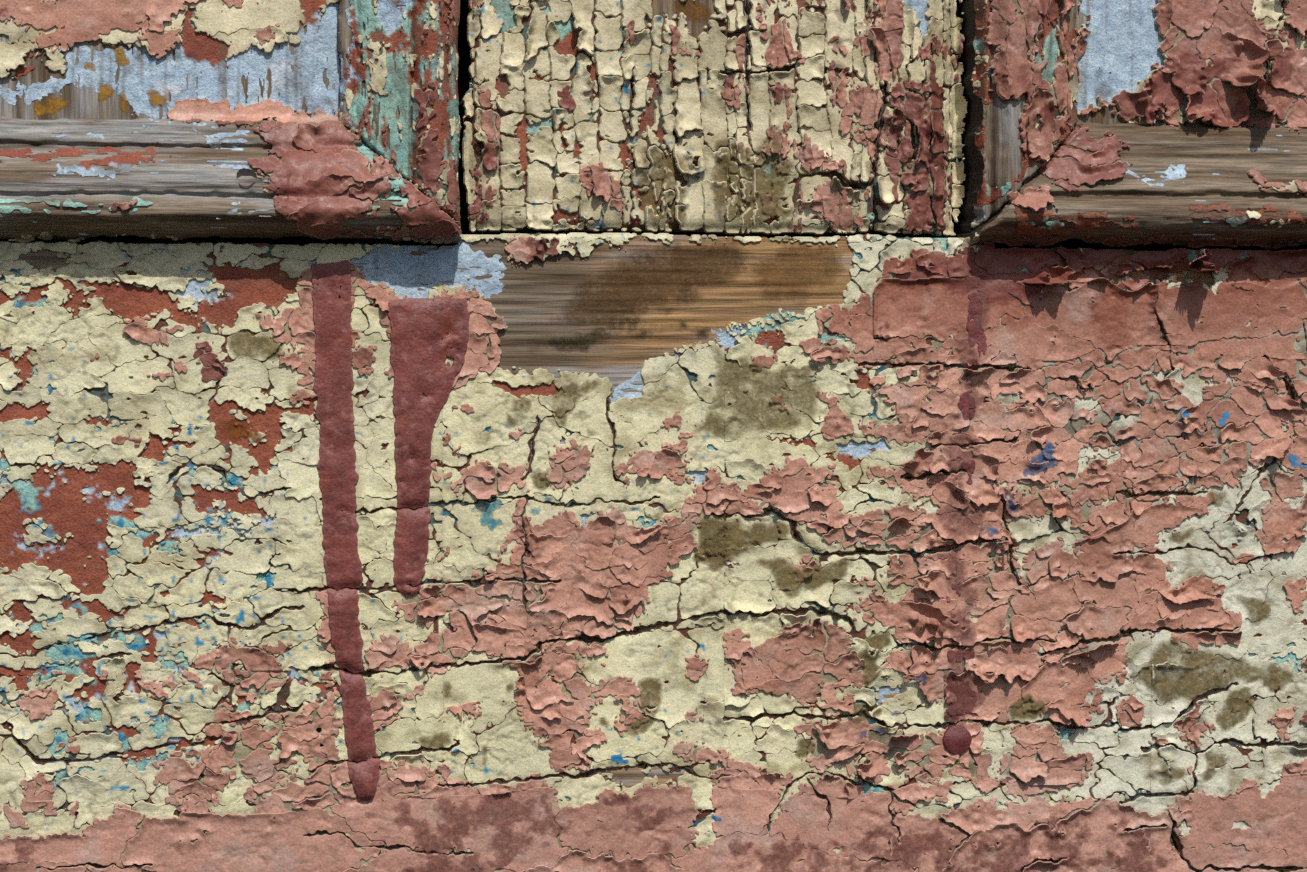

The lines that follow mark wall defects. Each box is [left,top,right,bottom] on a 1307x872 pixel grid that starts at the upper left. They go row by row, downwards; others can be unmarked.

peeling [421,0,460,42]
peeling [0,0,307,120]
peeling [321,50,356,90]
peeling [355,34,392,101]
peeling [438,32,458,80]
peeling [449,116,461,142]
peeling [167,68,402,240]
crack [836,168,874,213]
peeling [1246,211,1290,228]
peeling [229,410,250,424]
peeling [350,263,407,588]
peeling [19,518,74,551]